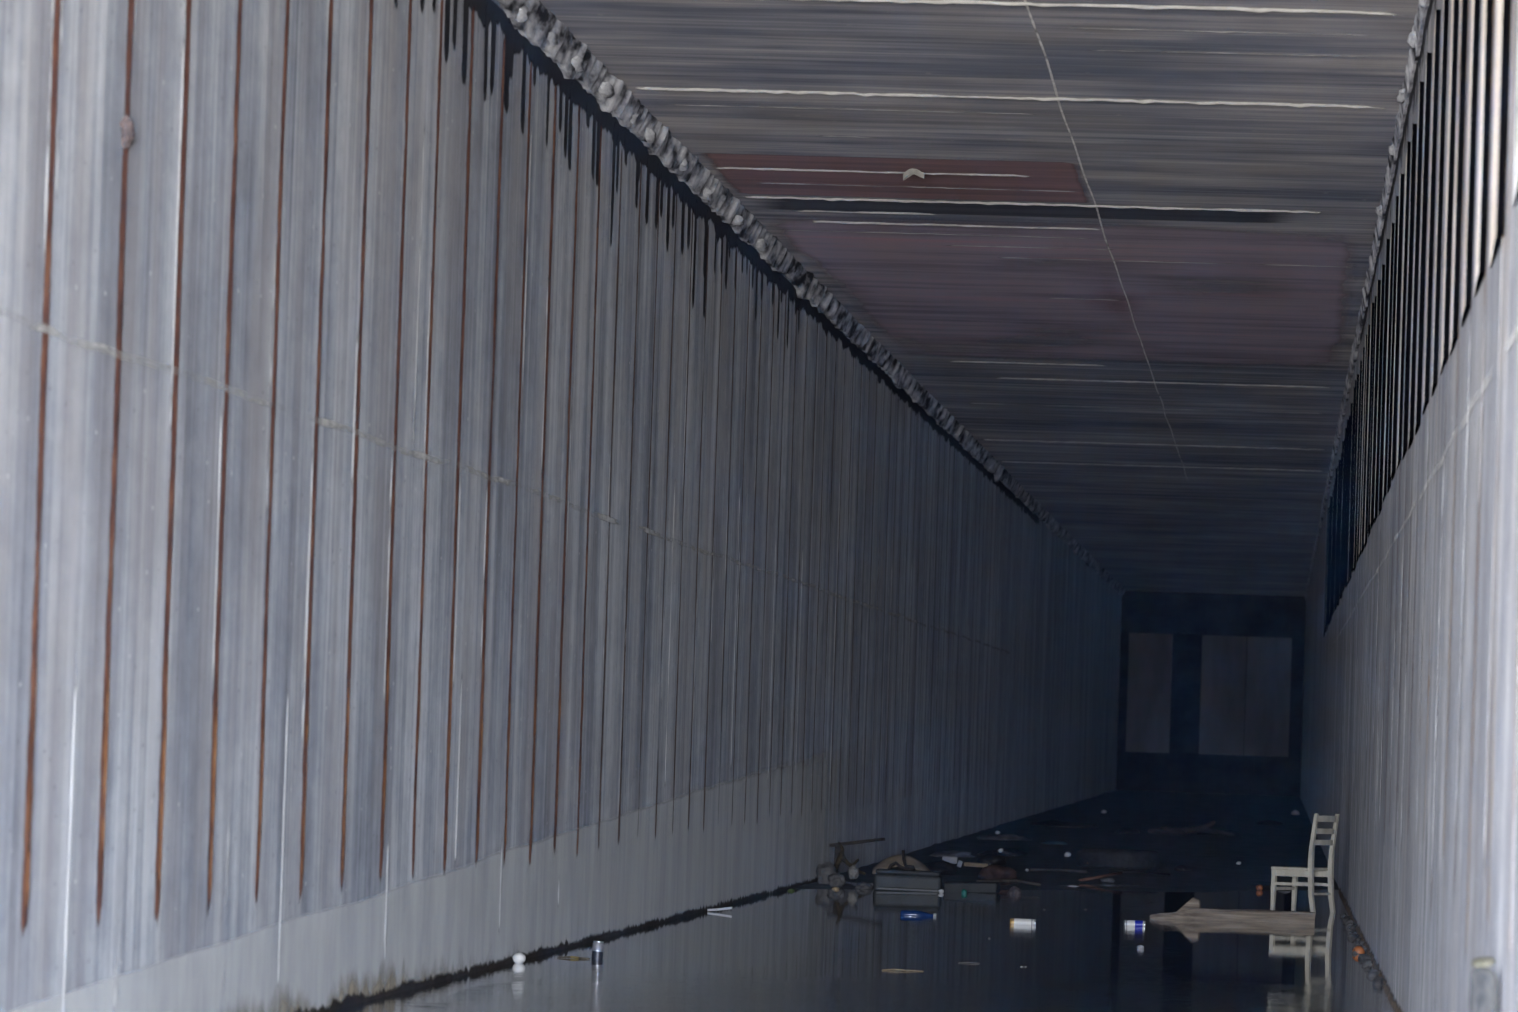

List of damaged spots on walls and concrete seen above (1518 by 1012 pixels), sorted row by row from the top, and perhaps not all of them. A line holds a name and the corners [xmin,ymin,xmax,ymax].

corrosion [21,0,63,934]
corrosion [96,147,129,922]
corrosion [125,0,134,118]
crack [1024,0,1188,480]
water stain [13,544,868,1012]